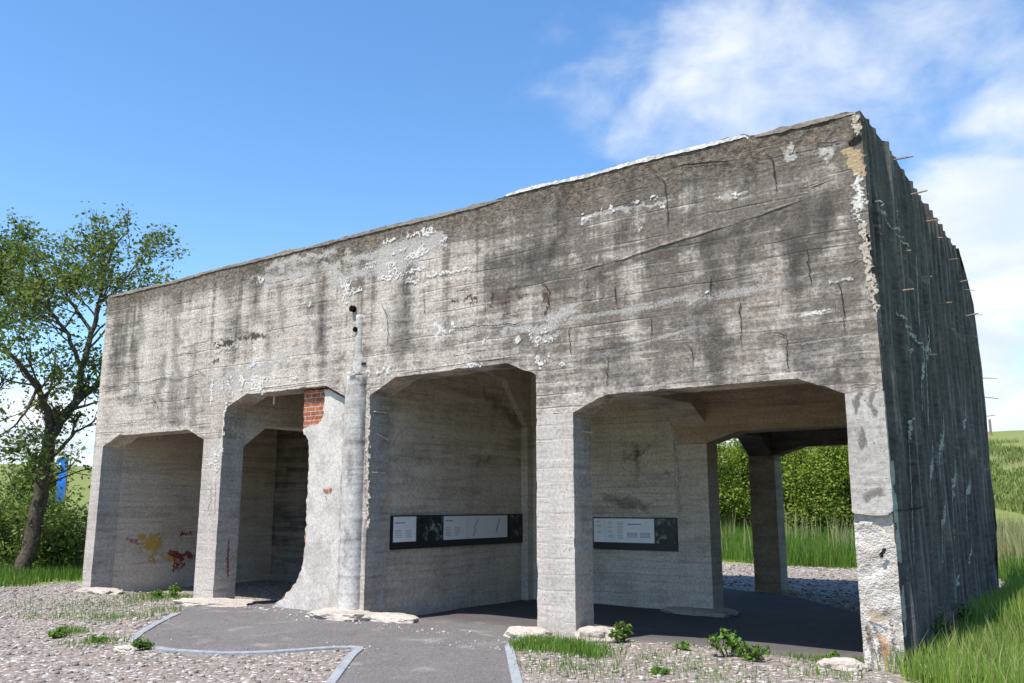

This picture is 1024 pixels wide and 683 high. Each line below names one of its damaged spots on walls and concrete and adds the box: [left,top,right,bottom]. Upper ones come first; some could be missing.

spalling [110,199,502,298]
damp [251,225,470,304]
crack [656,160,735,226]
crack [765,152,819,192]
spalling [755,112,880,312]
spalling [854,520,905,672]